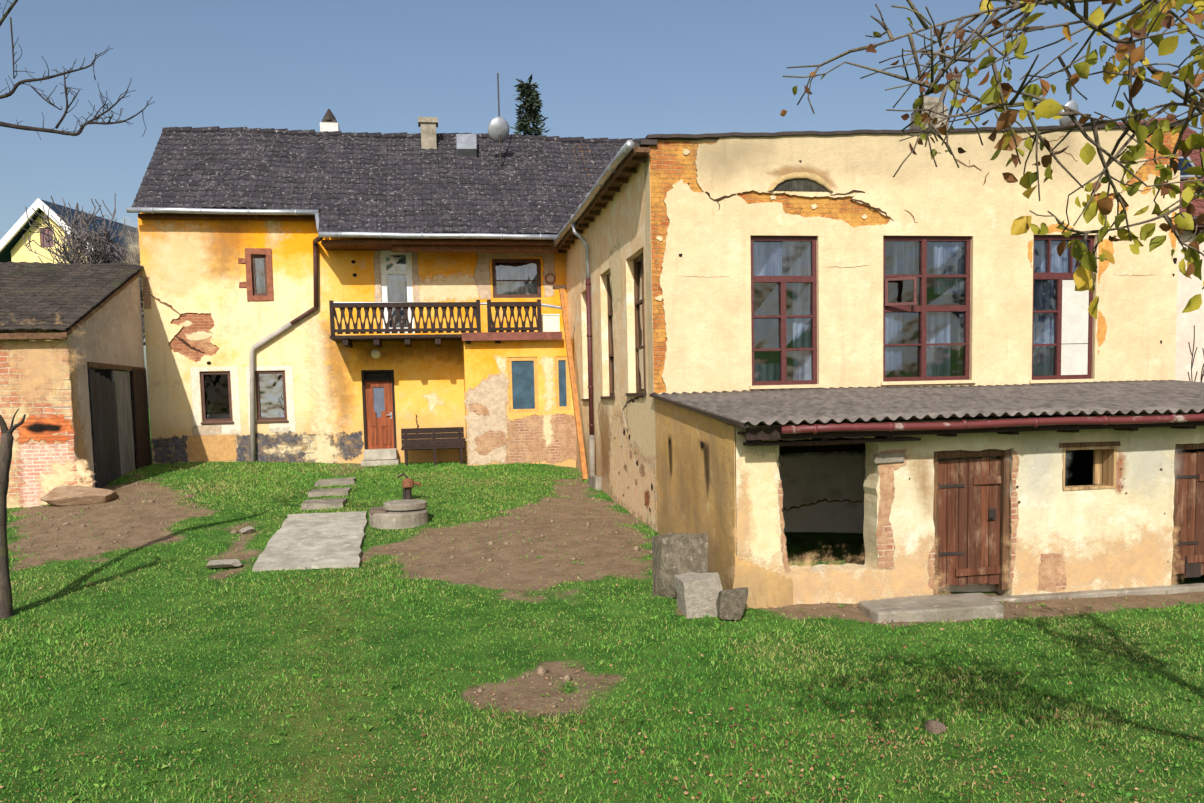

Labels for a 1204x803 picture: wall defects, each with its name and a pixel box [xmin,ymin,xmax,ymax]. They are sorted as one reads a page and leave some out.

crack [956,159,989,186]
flaking render [1094,128,1179,211]
flaking render [737,191,890,227]
peeling [610,243,623,312]
flaking render [614,140,716,466]
flaking render [1028,221,1075,268]
flaking render [1098,239,1114,288]
flaking render [169,313,219,365]
peeling [151,424,221,464]
peeling [236,317,364,463]
flaking render [505,356,577,464]
flaking render [876,449,910,569]